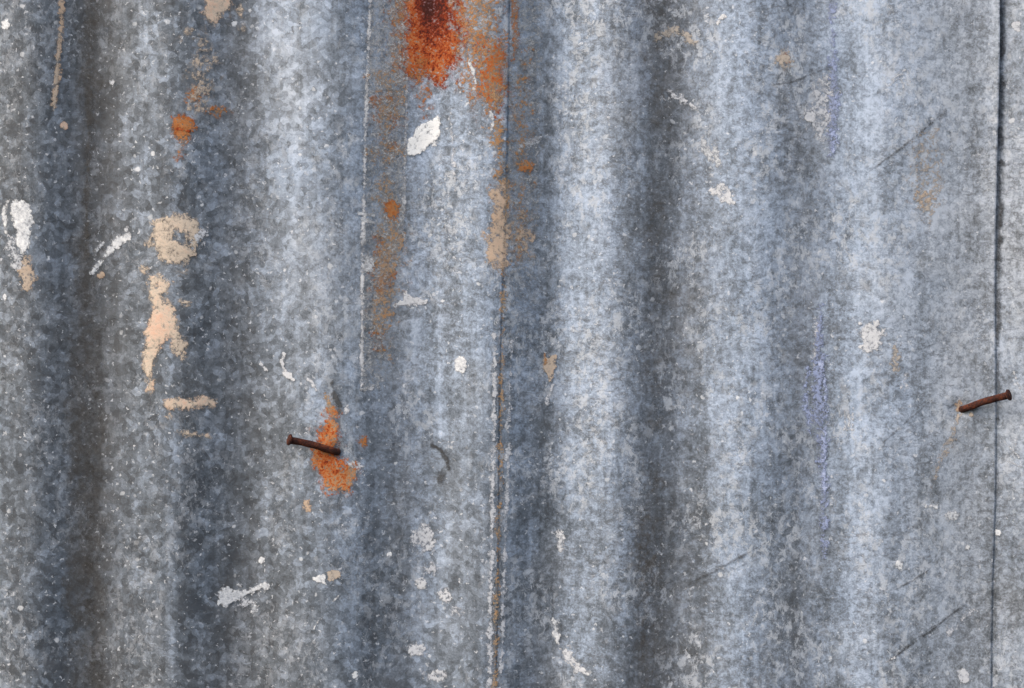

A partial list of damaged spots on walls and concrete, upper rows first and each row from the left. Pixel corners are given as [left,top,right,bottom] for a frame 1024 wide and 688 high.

corrosion [170,38,227,161]
corrosion [363,0,535,688]
corrosion [310,381,368,496]